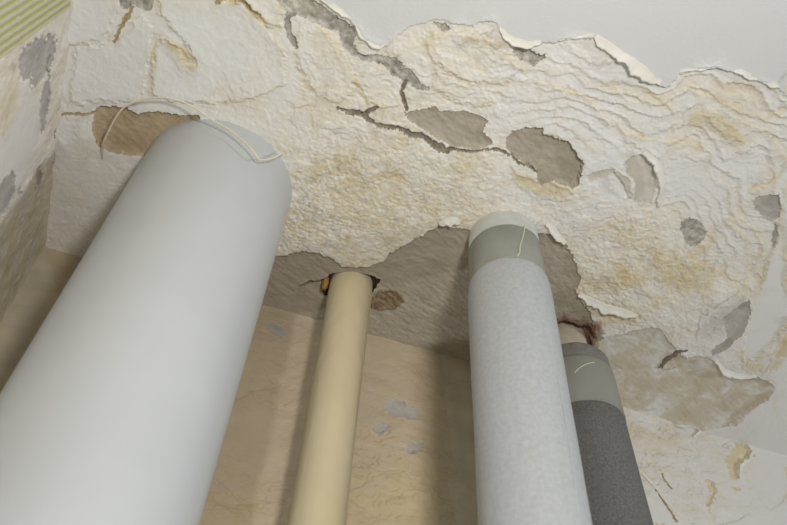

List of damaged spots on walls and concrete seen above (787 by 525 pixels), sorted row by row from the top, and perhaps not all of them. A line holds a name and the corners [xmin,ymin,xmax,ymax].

crack [112,5,135,44]
crack [214,0,261,17]
spalling [277,0,430,91]
spalling [512,47,546,67]
crack [336,79,538,173]
peeling [438,217,462,228]
peeling [545,222,568,245]
peeling [45,247,82,297]
rust [556,312,606,348]
peeling [212,305,323,523]
peeling [352,334,452,487]
peeling [623,407,754,525]